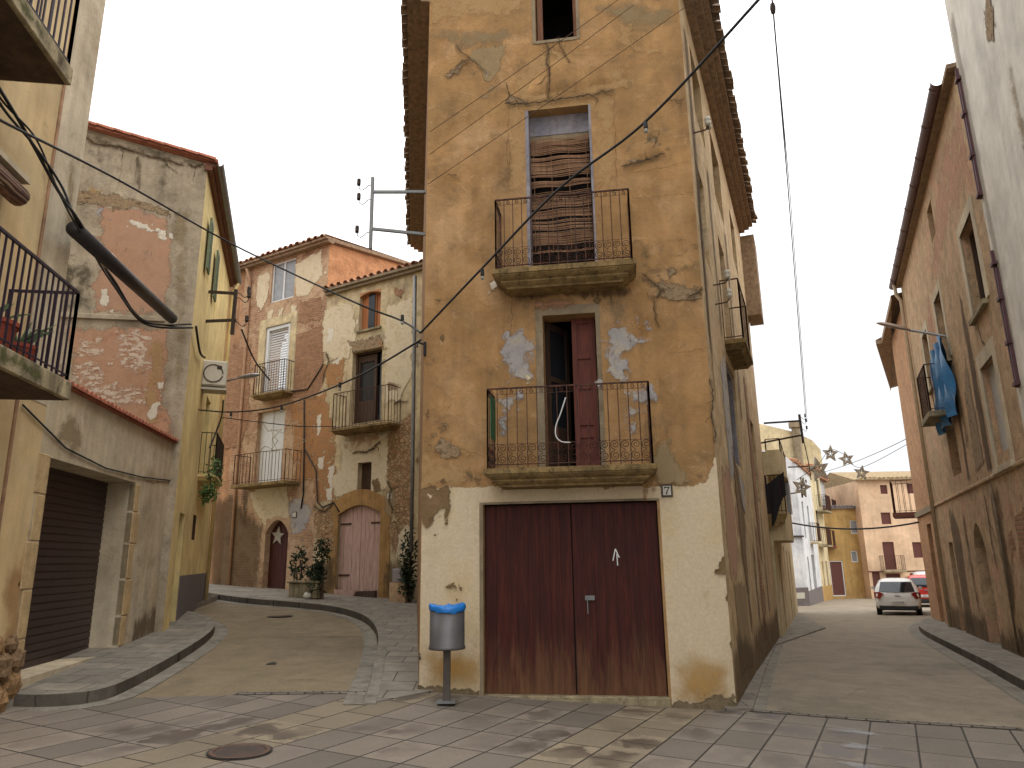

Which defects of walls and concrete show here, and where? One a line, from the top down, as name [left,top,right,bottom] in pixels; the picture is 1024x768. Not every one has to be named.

flaking render [77,187,177,242]
peeling [100,289,114,313]
crack [449,36,750,575]
peeling [144,340,164,423]
flaking render [221,344,253,449]
peeling [499,329,536,435]
peeling [595,317,658,433]
flaking render [250,413,468,565]
water stain [687,521,780,703]
water stain [949,513,1024,658]
water stain [991,493,1015,608]